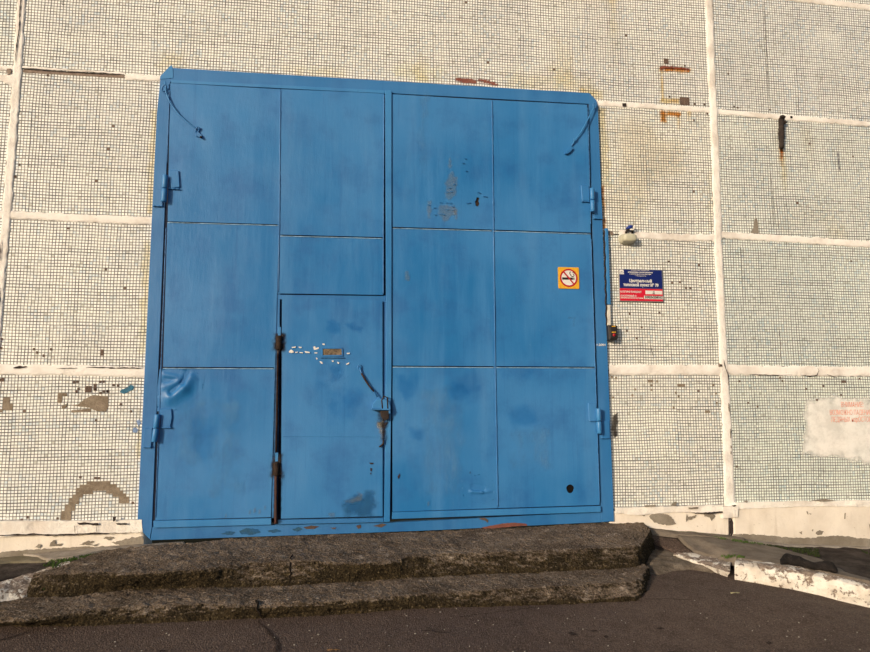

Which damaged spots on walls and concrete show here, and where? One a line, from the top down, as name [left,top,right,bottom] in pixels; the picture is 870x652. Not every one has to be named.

spalling [56,476,134,520]